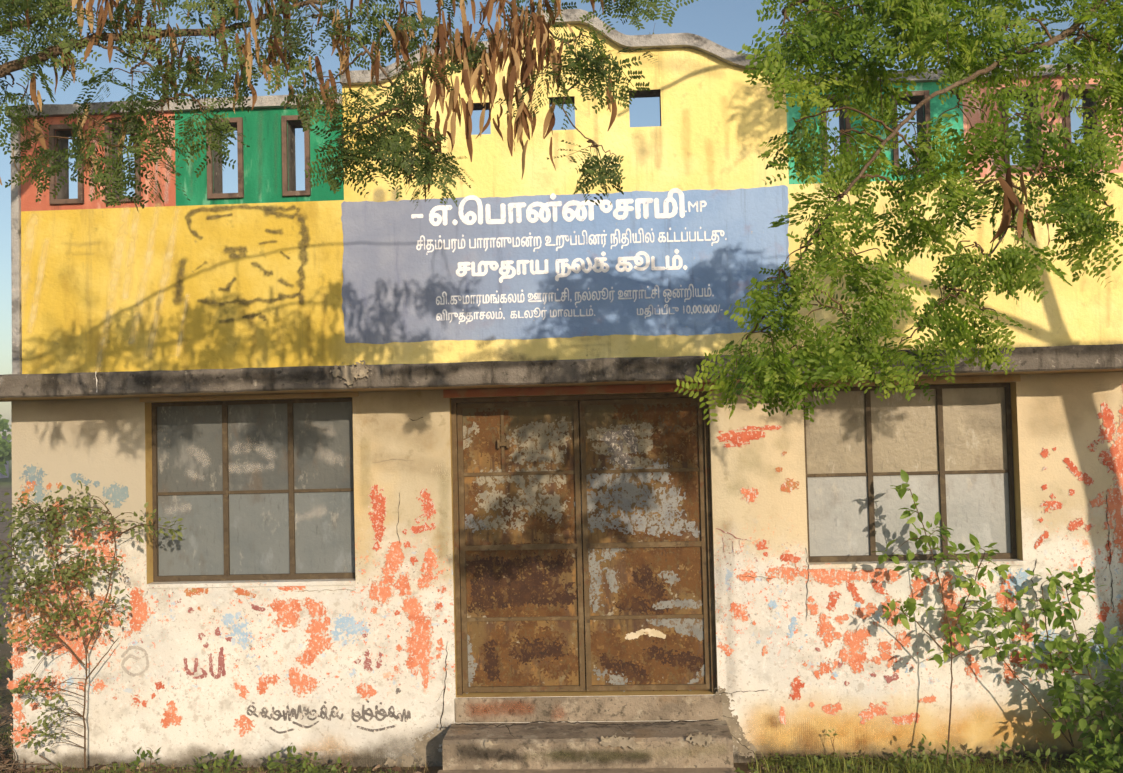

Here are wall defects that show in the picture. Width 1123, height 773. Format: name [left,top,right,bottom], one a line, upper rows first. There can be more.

peeling [4,463,183,748]
peeling [177,484,448,737]
rust [463,403,708,691]
peeling [716,424,782,448]
peeling [736,539,980,725]
peeling [995,568,1079,684]
peeling [1034,383,1123,565]
peeling [1088,636,1110,665]
peeling [1097,598,1123,631]
spalling [384,724,449,767]